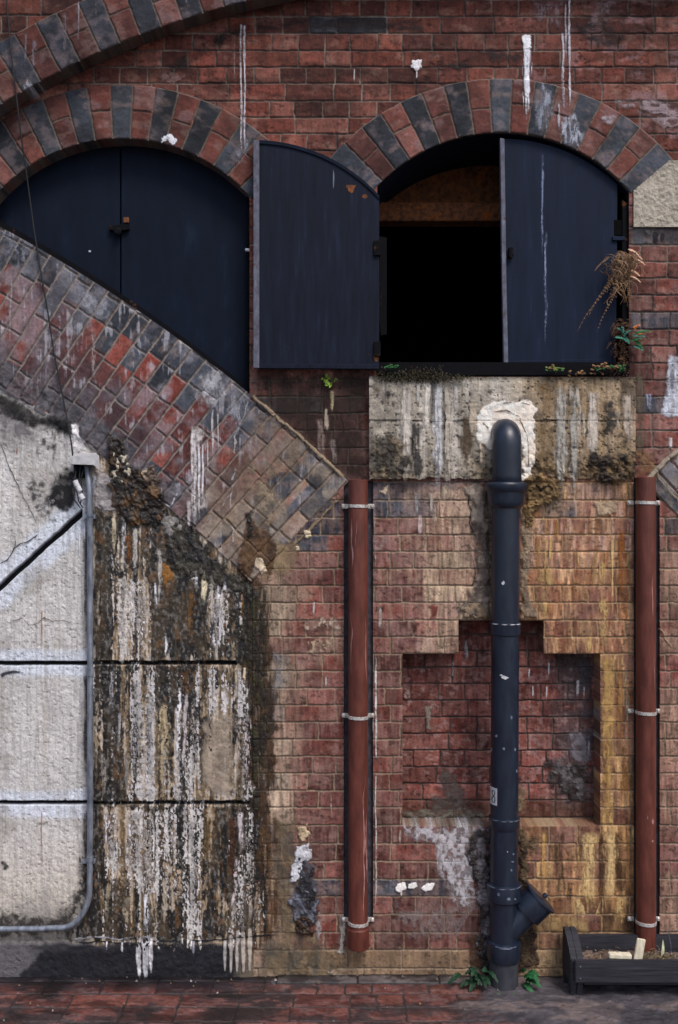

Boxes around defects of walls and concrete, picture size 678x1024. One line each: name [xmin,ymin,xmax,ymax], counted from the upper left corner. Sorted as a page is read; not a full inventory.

damp [204,24,248,156]
damp [522,0,583,143]
damp [602,100,678,127]
damp [80,292,107,318]
damp [386,380,483,533]
damp [0,372,282,978]
damp [305,603,341,653]
spalling [288,824,320,937]
damp [399,817,484,933]